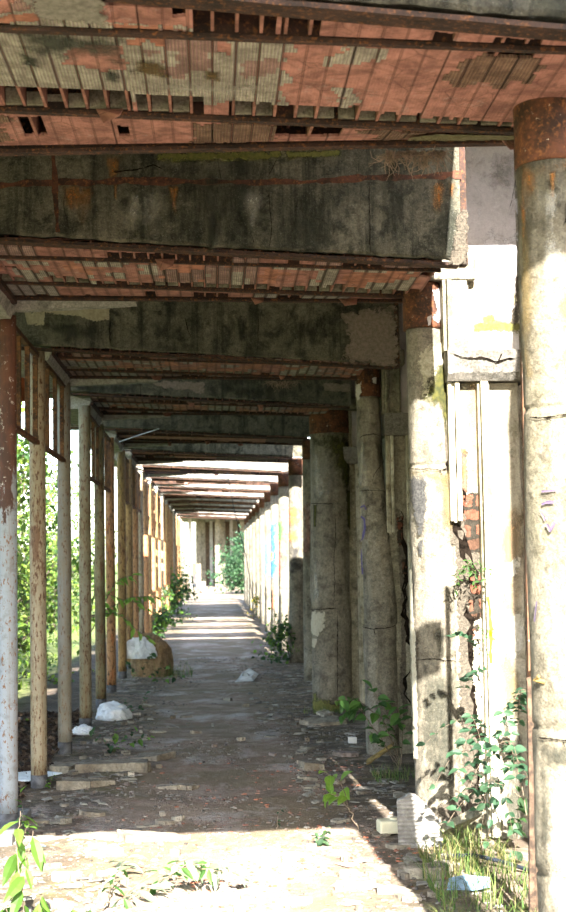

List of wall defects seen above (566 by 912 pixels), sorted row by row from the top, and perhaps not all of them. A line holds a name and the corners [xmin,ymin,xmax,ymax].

water stain [385,165,404,235]
peeling [340,304,401,367]
crack [451,353,519,363]
peeling [468,275,520,336]
crack [530,413,566,421]
peeling [311,610,327,648]
crack [312,503,338,693]
crack [364,420,511,811]